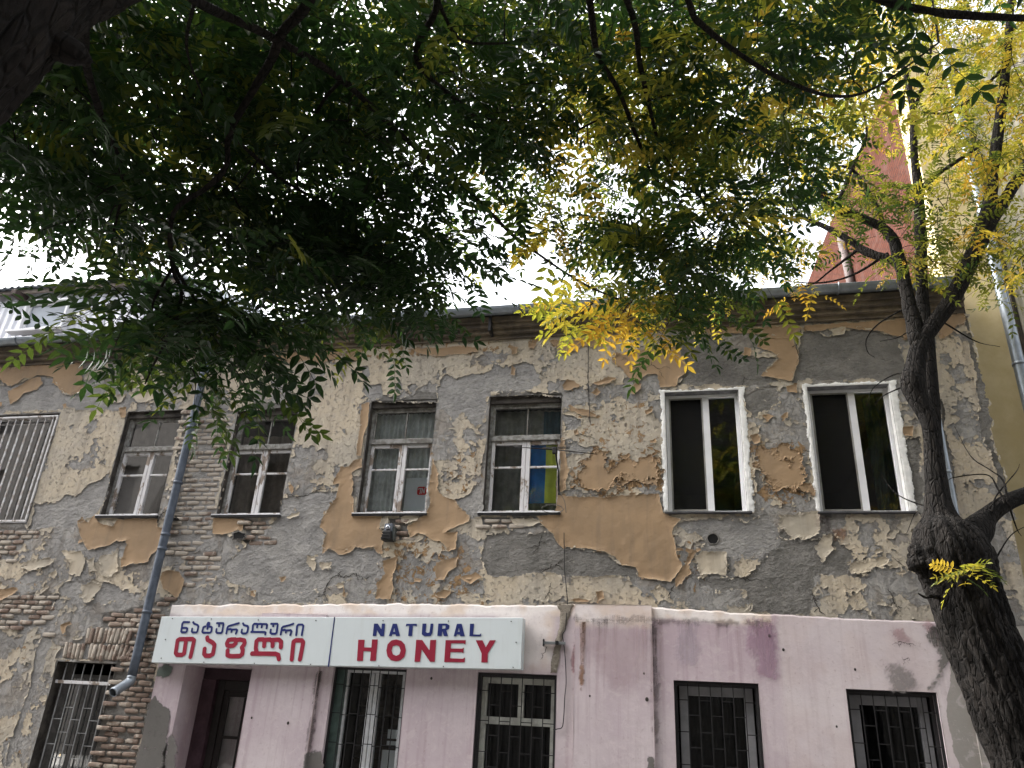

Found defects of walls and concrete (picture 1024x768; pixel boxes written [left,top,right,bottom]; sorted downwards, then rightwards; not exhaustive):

flaking render [938,313,1008,500]
flaking render [0,341,892,768]
water stain [748,619,776,677]